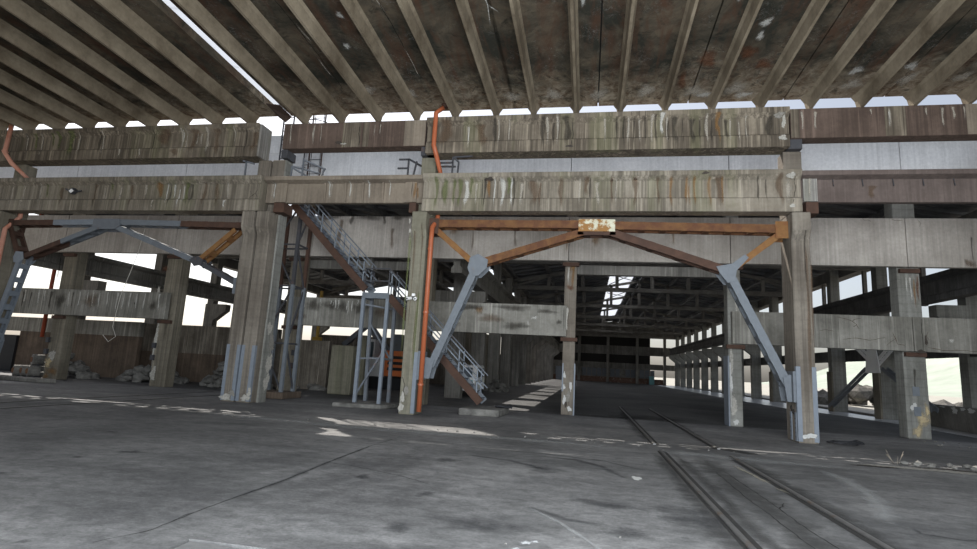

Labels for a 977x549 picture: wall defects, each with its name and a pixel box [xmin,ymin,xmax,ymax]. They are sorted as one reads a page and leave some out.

water stain [467,119,510,143]
water stain [541,116,570,139]
water stain [604,113,712,139]
water stain [435,178,541,202]
spalling [263,322,274,391]
spalling [218,388,251,401]